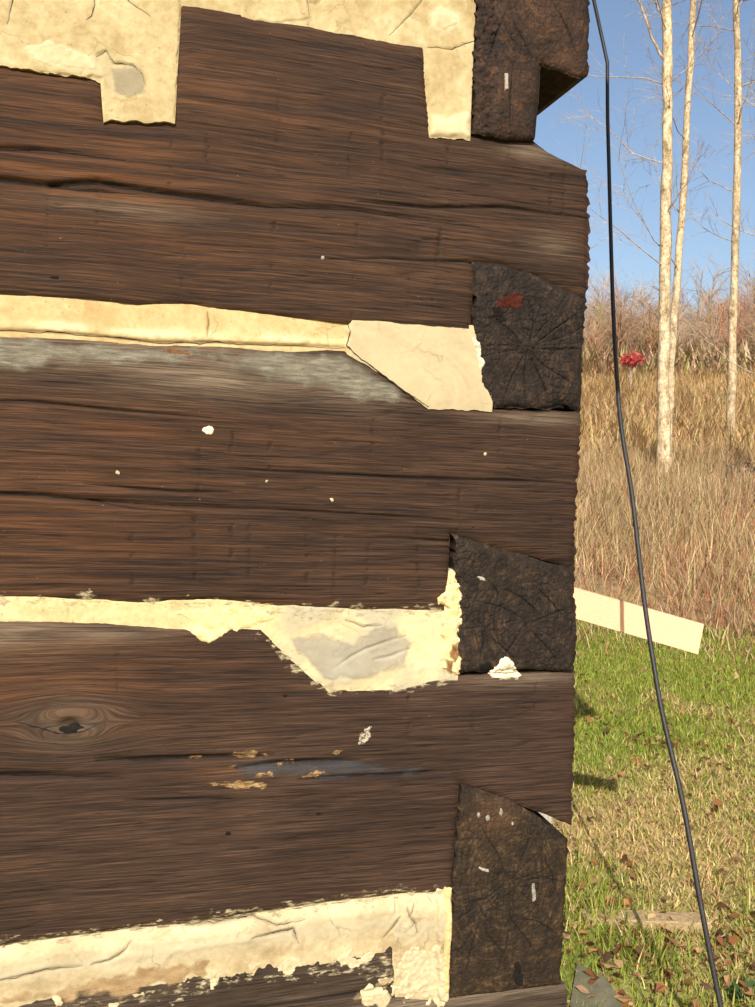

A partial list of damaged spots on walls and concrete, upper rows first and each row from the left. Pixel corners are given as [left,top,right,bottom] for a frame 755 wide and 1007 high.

damp [0,338,191,369]
damp [242,354,399,401]
peeling [201,970,221,990]
peeling [278,957,302,975]
peeling [337,948,383,968]
peeling [360,977,393,1007]